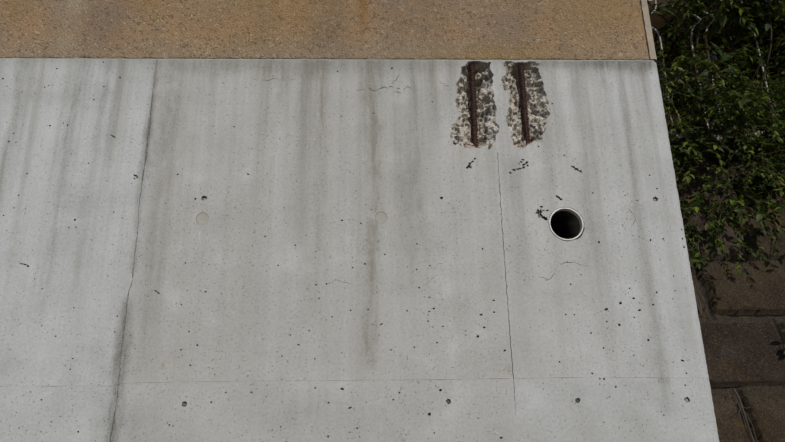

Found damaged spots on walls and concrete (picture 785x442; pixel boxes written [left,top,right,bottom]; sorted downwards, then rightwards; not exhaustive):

crack [110,58,158,442]
spalling [450,61,553,149]